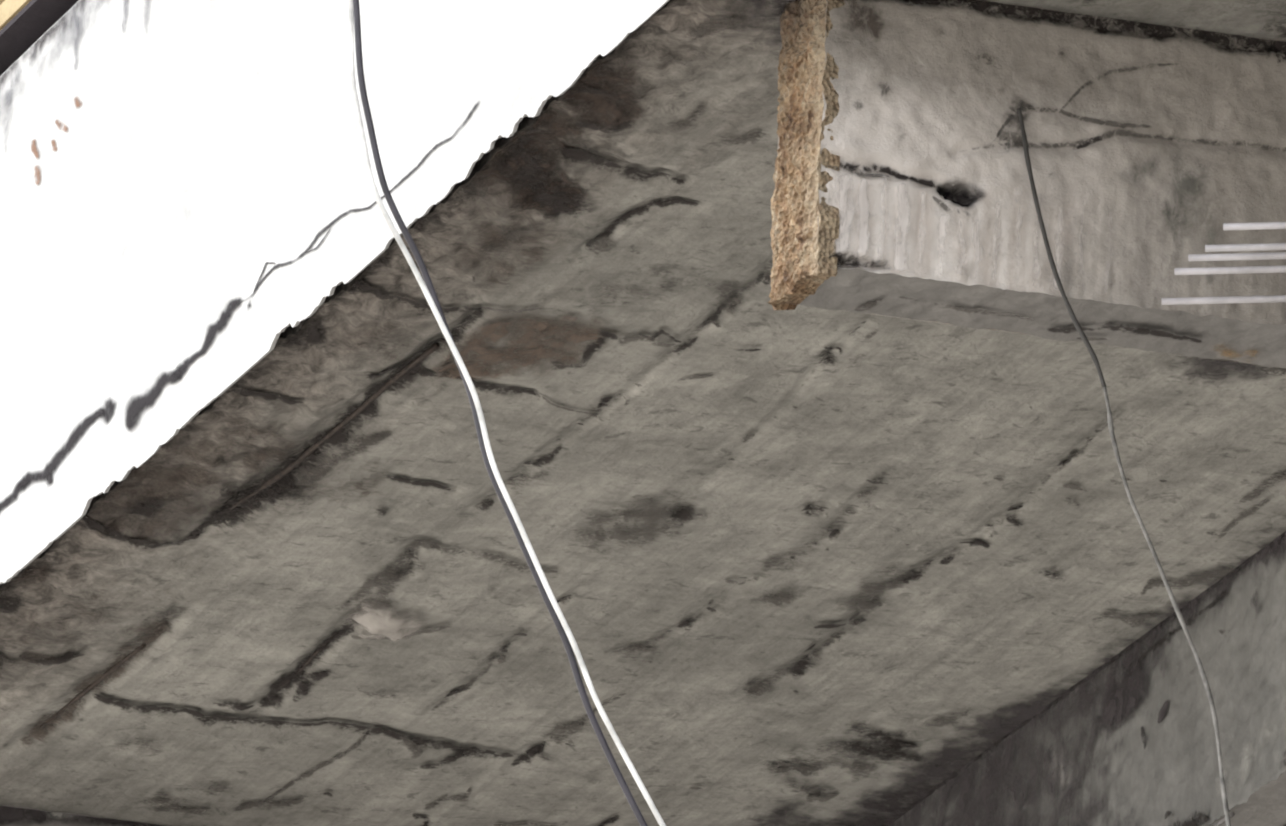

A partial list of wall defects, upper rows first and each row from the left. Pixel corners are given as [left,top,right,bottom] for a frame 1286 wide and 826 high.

crack [986,63,1286,151]
crack [560,142,698,254]
crack [828,162,935,187]
crack [0,103,479,511]
crack [353,281,541,313]
leakage [577,493,706,553]
leakage [1219,470,1286,537]
leakage [754,531,1286,826]
crack [94,694,625,826]
leakage [0,781,227,826]
leakage [234,796,306,811]